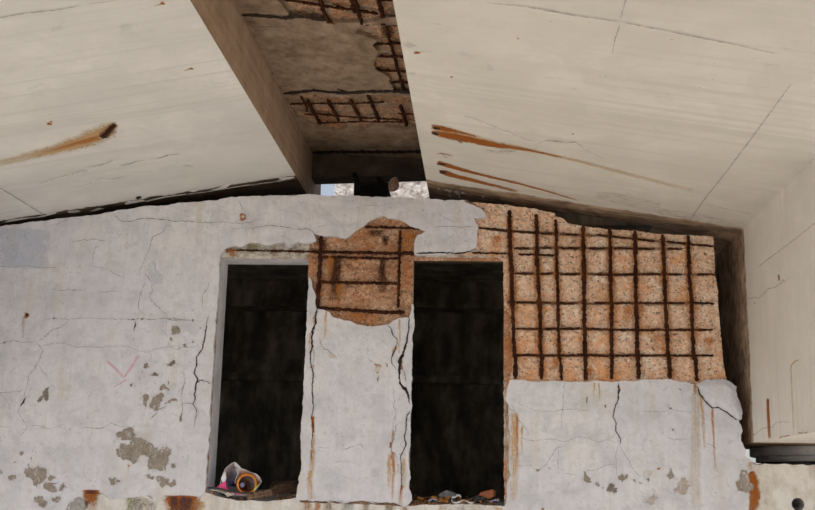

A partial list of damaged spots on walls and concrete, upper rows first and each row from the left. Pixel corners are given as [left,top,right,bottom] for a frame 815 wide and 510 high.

spalling [284,0,408,91]
rust [23,123,118,158]
rust [431,125,571,160]
rust [437,161,573,199]
spalling [228,217,424,327]
crack [0,239,210,437]
spalling [457,195,727,504]
peeling [0,464,85,510]
peeling [116,427,176,488]
crack [310,309,410,508]
crack [603,382,632,471]
rust [748,462,760,510]